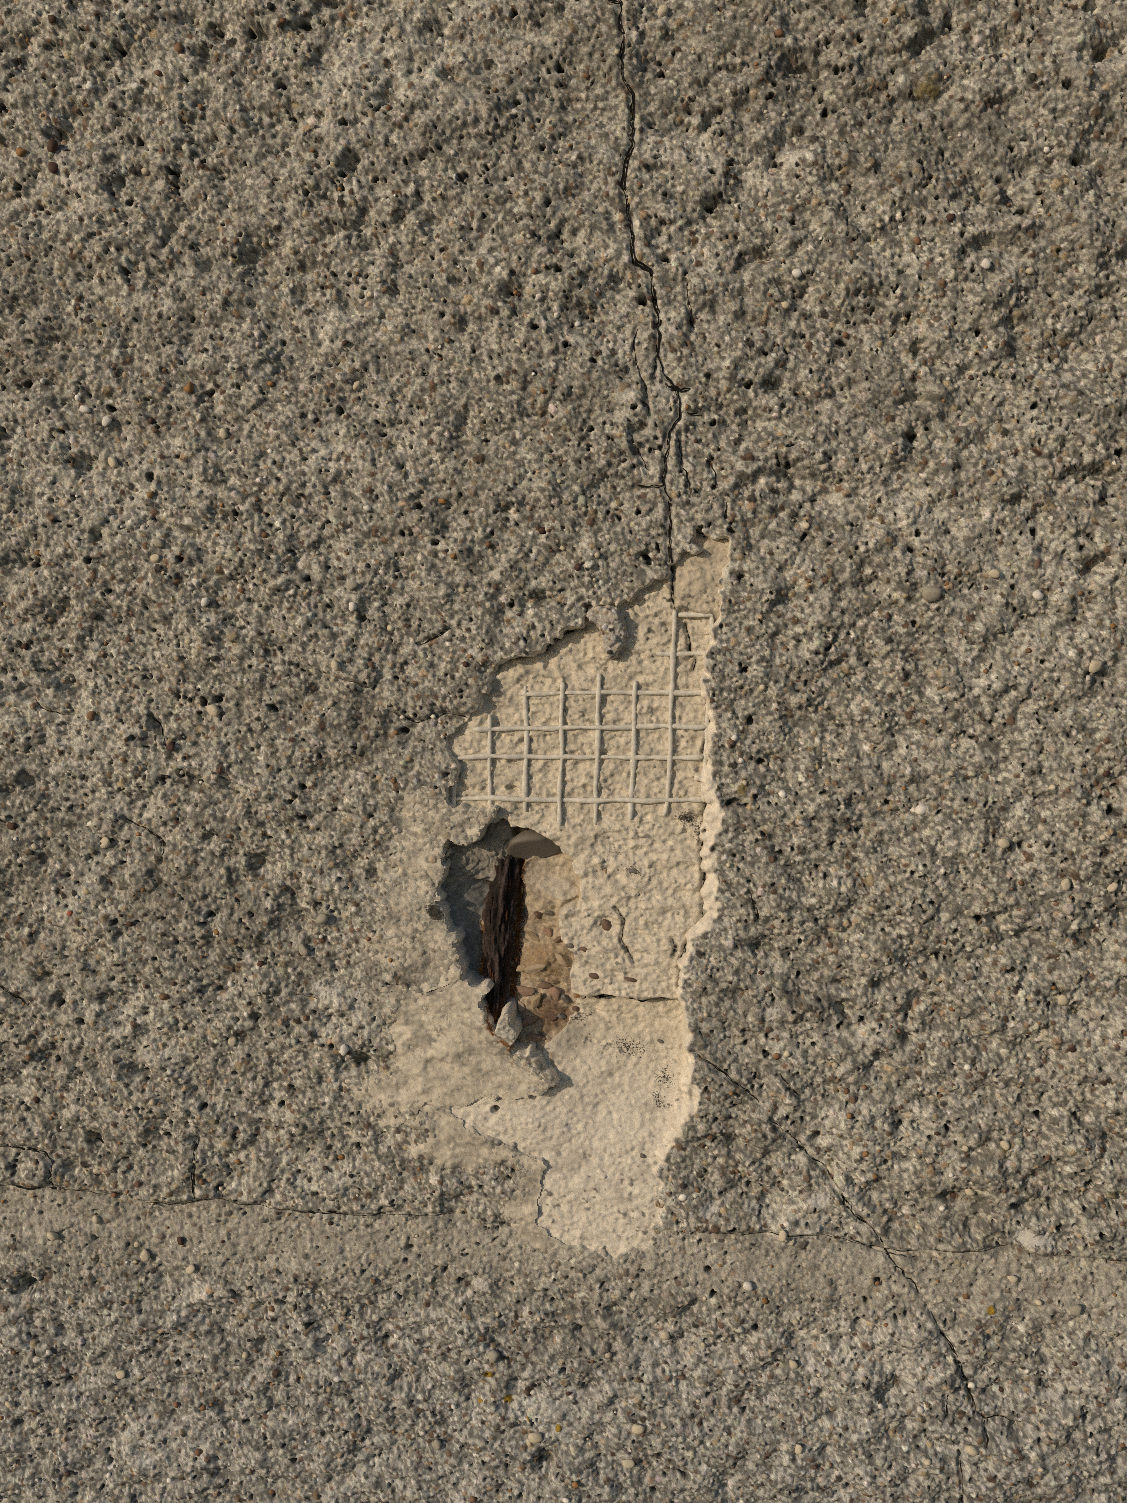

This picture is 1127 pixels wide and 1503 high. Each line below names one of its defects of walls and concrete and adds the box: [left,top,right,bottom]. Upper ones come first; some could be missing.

crack [608,0,727,668]
crack [0,1139,454,1216]
rust [478,854,579,1052]
flaking render [341,528,732,1257]
crack [695,1053,1014,1503]